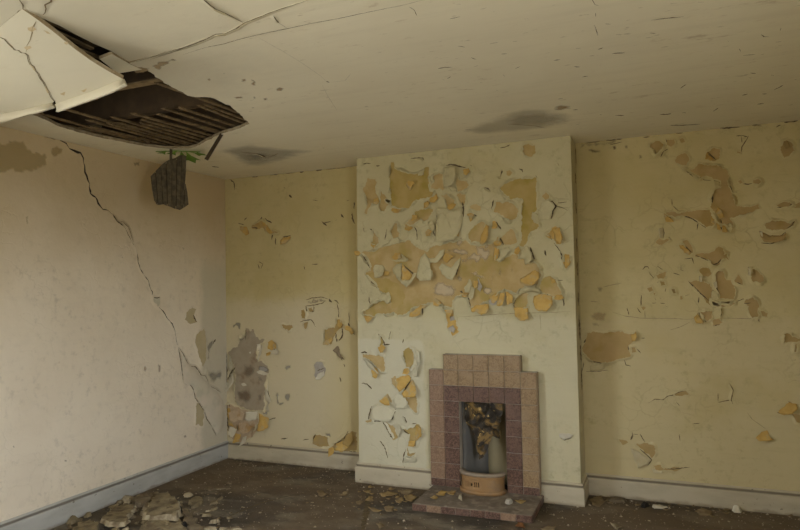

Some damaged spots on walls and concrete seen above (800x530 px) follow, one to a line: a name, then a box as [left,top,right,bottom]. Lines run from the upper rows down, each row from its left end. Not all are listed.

crack [7,0,52,97]
crack [133,0,422,63]
crack [44,137,222,435]
flaking render [225,326,279,447]
peeling [280,297,354,366]
peeling [304,429,359,457]
peeling [361,331,424,463]
peeling [354,157,578,338]
peeling [579,320,643,382]
peeling [639,124,770,328]
peeling [759,199,800,244]